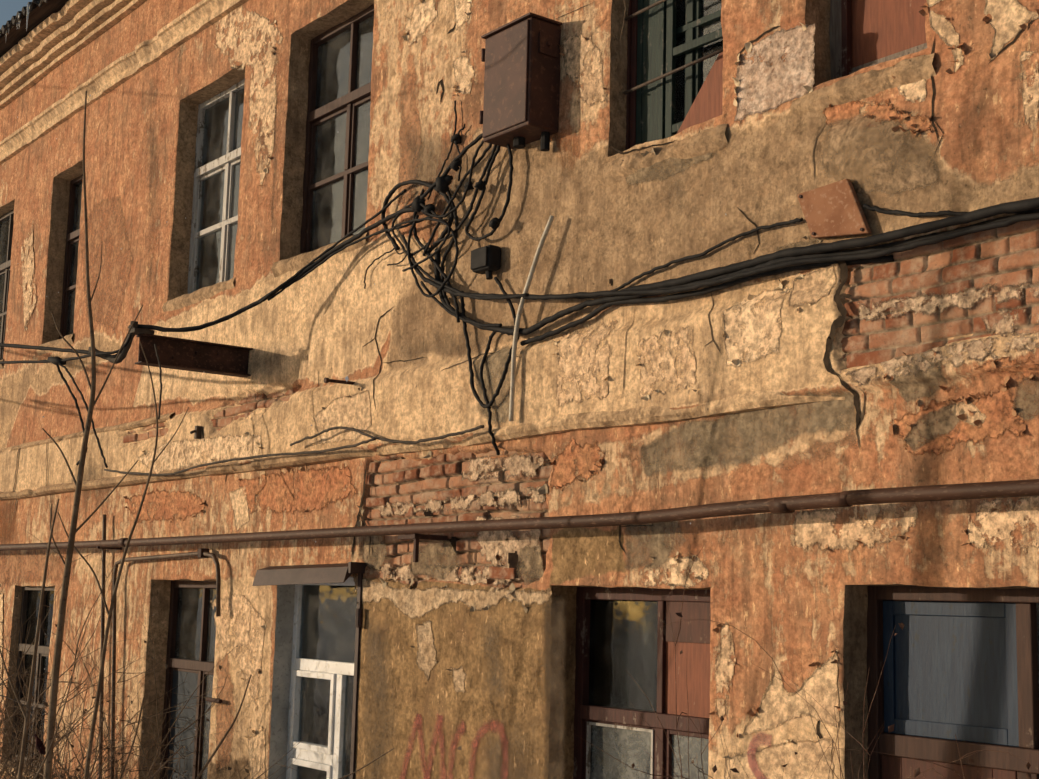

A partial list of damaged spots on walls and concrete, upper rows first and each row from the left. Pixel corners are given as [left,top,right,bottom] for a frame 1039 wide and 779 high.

peeling [212,6,283,189]
peeling [731,22,815,121]
crack [931,37,944,155]
peeling [982,0,1039,61]
crack [823,261,865,449]
spalling [722,219,1039,458]
damp [641,392,854,476]
spalling [229,438,605,699]
peeling [790,501,931,553]
peeling [961,496,1039,555]
damp [545,603,564,779]
peeling [723,649,841,779]